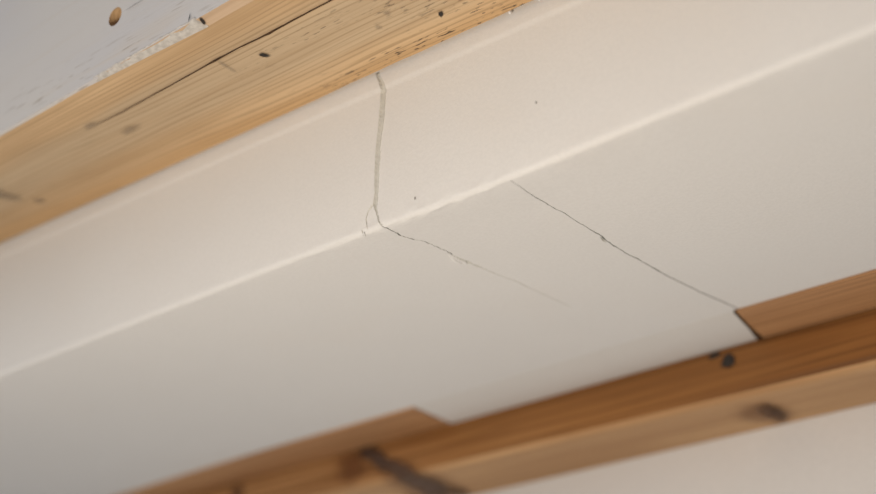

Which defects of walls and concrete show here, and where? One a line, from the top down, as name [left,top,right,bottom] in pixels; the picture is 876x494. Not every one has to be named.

crack [362,73,571,307]
crack [510,180,738,309]